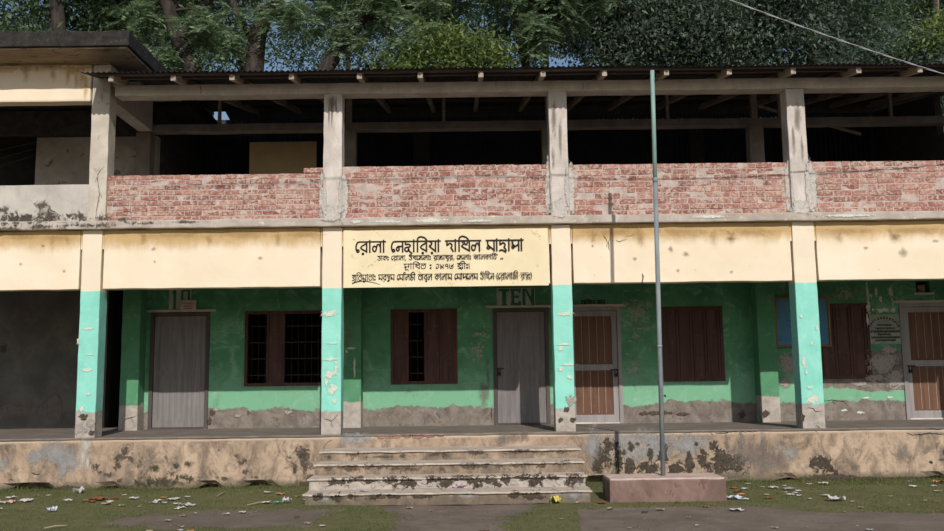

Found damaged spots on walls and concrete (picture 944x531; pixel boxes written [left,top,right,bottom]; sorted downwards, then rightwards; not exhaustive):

mould [0,200,154,232]
peeling [322,343,356,404]
peeling [850,345,907,399]
damp [81,440,194,488]